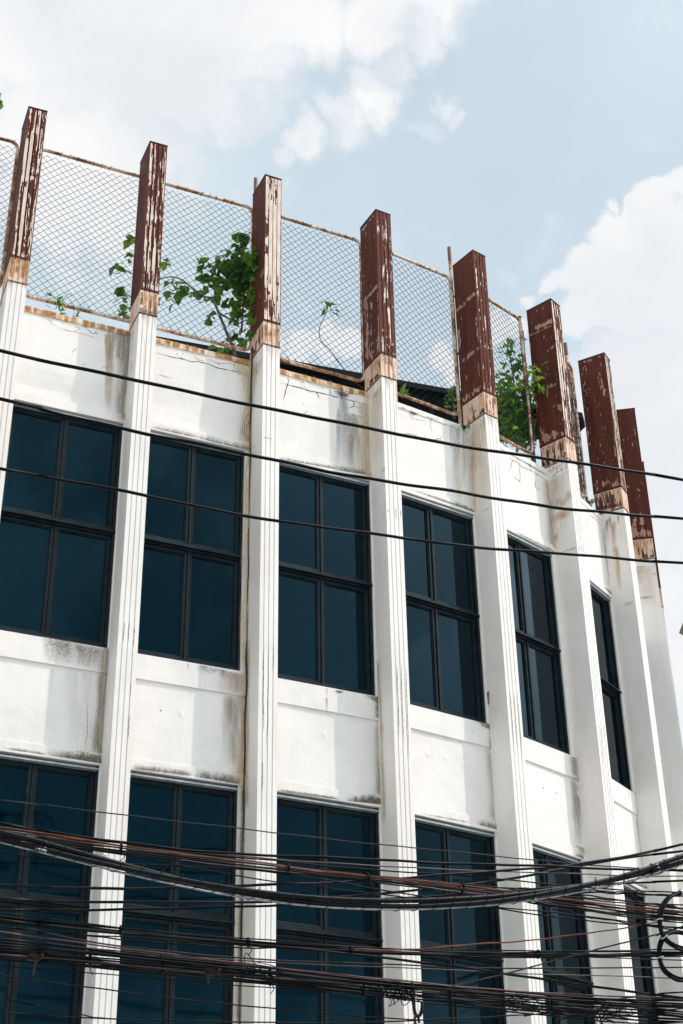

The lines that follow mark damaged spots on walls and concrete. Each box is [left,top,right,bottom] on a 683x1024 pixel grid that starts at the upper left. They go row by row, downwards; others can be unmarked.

corrosion [10,257,29,282]
corrosion [26,305,130,336]
water stain [105,332,131,418]
crack [155,352,237,378]
crack [282,378,362,418]
water stain [289,389,371,475]
water stain [59,648,109,763]
water stain [136,572,249,962]